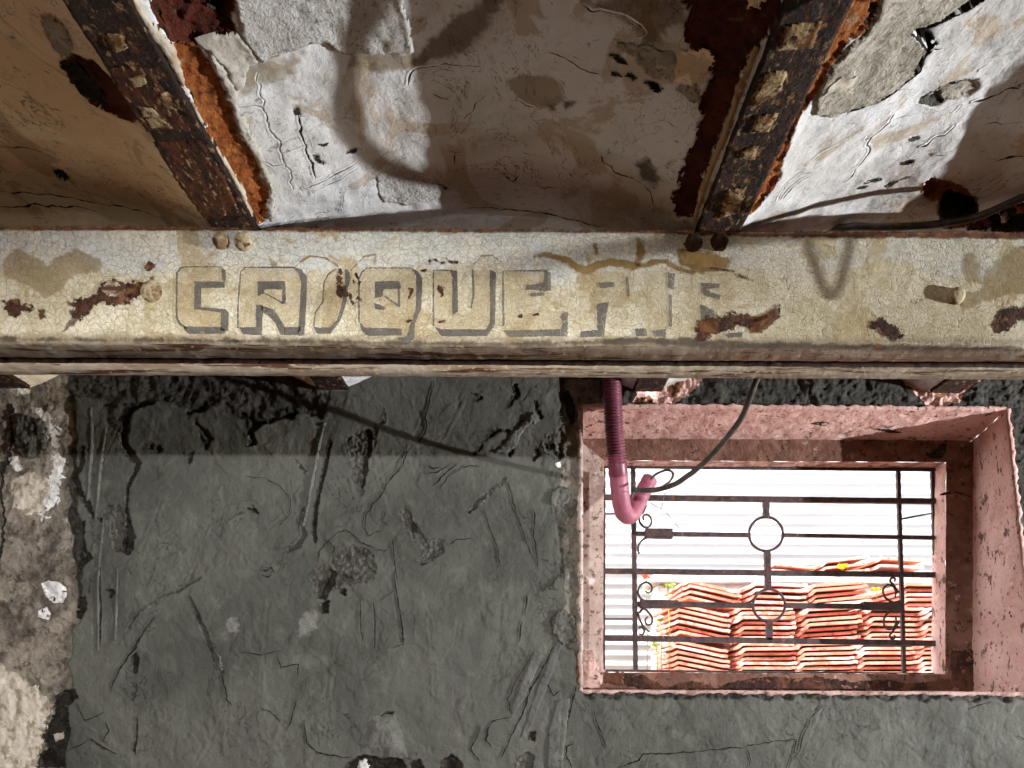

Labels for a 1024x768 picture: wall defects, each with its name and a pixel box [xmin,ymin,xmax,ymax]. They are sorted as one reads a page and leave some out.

peeling [150,0,416,224]
peeling [750,0,969,215]
crack [841,0,985,183]
crack [901,65,1024,166]
corrosion [64,261,155,331]
corrosion [694,304,781,342]
corrosion [870,317,904,351]
corrosion [992,305,1024,334]
peeling [31,403,66,522]
crack [316,380,435,650]
spalling [37,688,79,768]
crack [66,616,157,756]